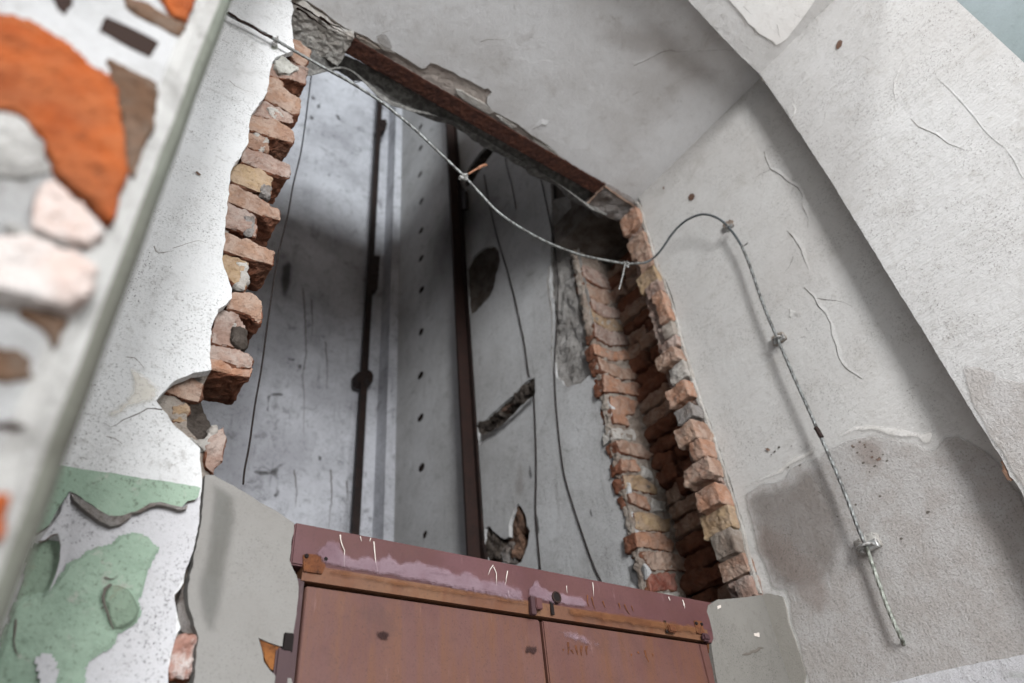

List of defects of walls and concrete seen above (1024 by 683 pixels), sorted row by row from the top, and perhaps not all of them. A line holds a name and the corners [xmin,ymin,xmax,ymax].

crack [893,61,964,150]
peeling [282,263,290,293]
flaking render [552,196,594,387]
crack [758,152,862,379]
peeling [0,466,200,683]
spalling [485,506,539,565]
peeling [628,565,645,587]
water stain [746,366,1024,683]